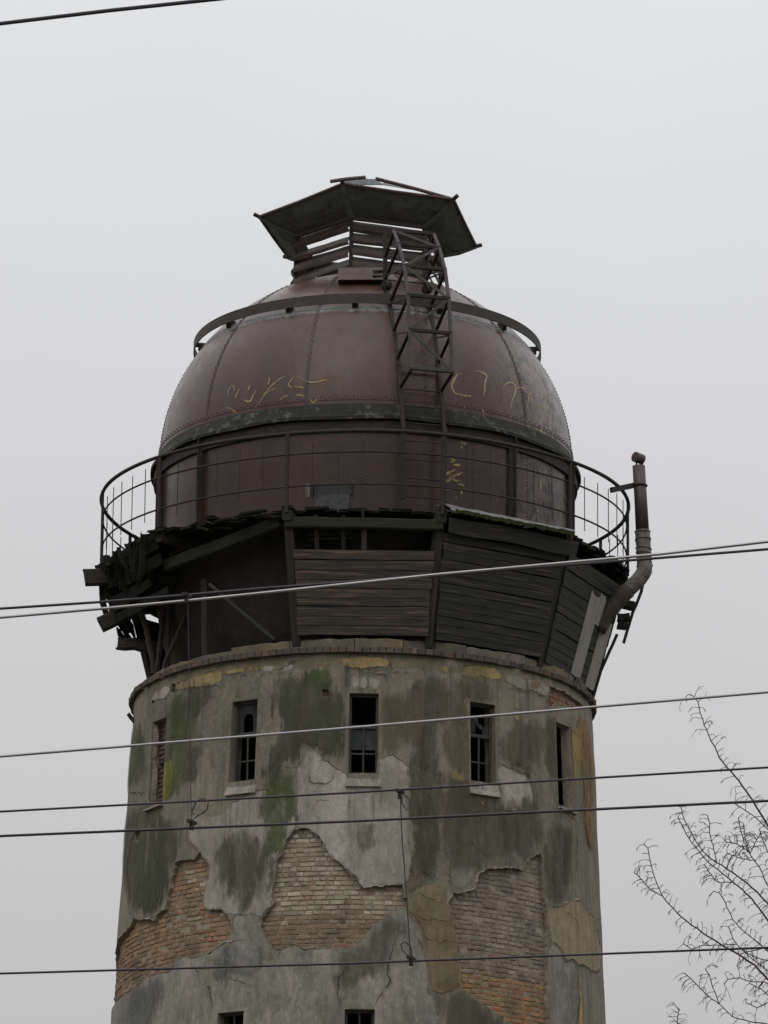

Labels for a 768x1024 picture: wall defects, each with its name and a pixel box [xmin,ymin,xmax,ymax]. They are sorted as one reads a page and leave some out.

peeling [111,749,438,1024]
spalling [447,853,601,1024]